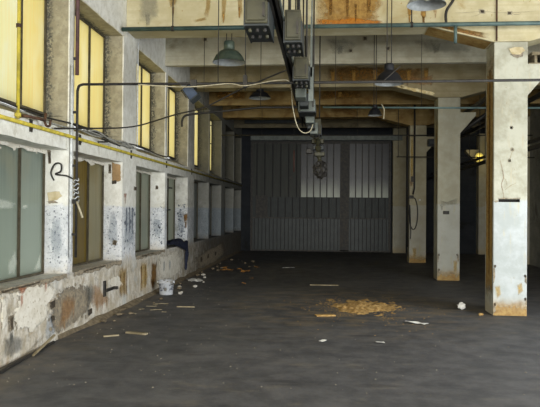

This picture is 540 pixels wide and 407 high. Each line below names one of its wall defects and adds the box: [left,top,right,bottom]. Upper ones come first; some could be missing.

spalling [509,47,525,58]
peeling [108,276,123,288]
corrosion [437,272,459,281]
peeling [1,282,92,334]
corrosion [493,304,527,316]